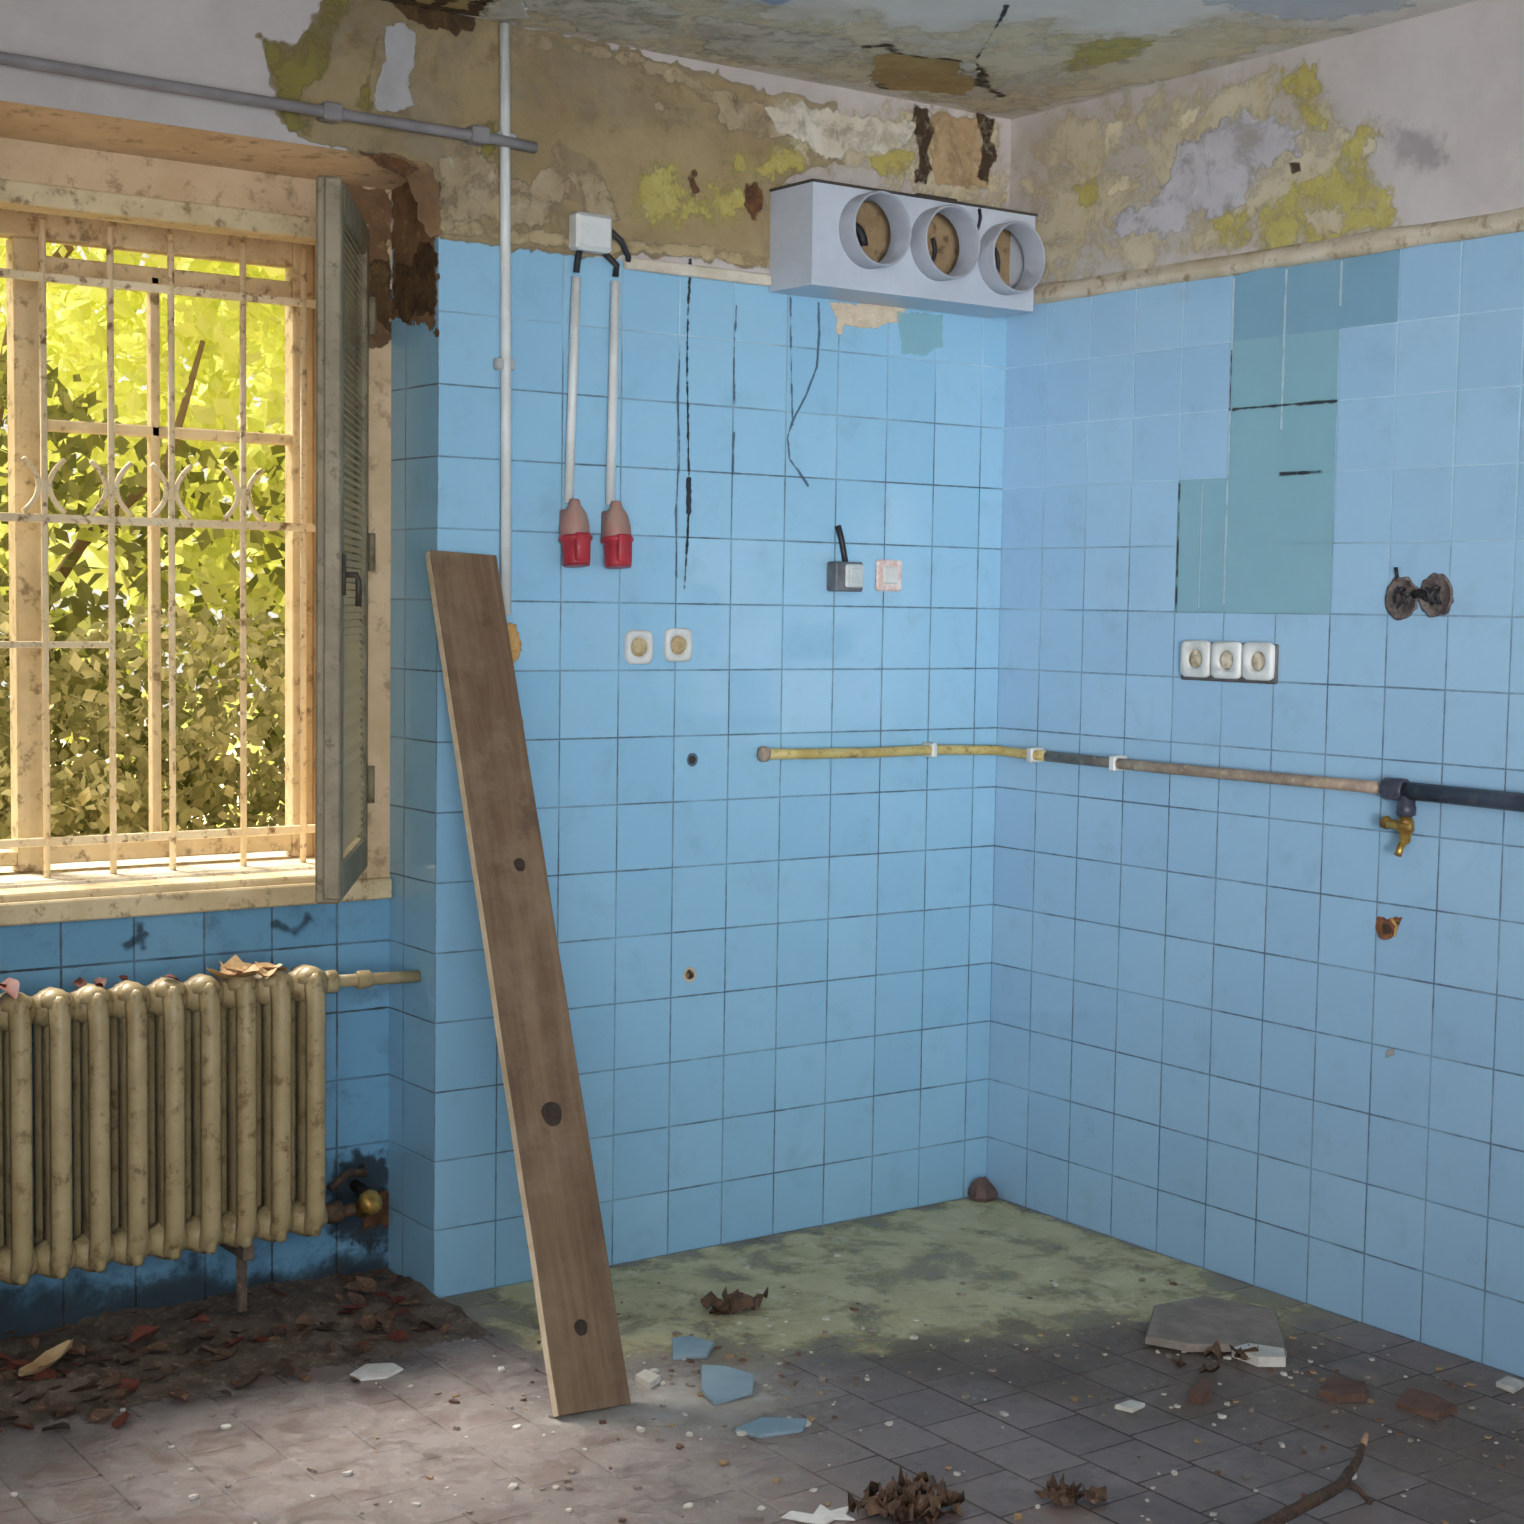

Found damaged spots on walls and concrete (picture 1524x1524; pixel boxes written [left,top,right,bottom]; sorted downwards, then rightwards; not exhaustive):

flaking render [862,44,1005,97]
peeling [1277,63,1327,131]
peeling [256,0,845,349]
peeling [1304,204,1346,239]
damp [610,1199,1311,1354]
damp [484,1281,543,1350]